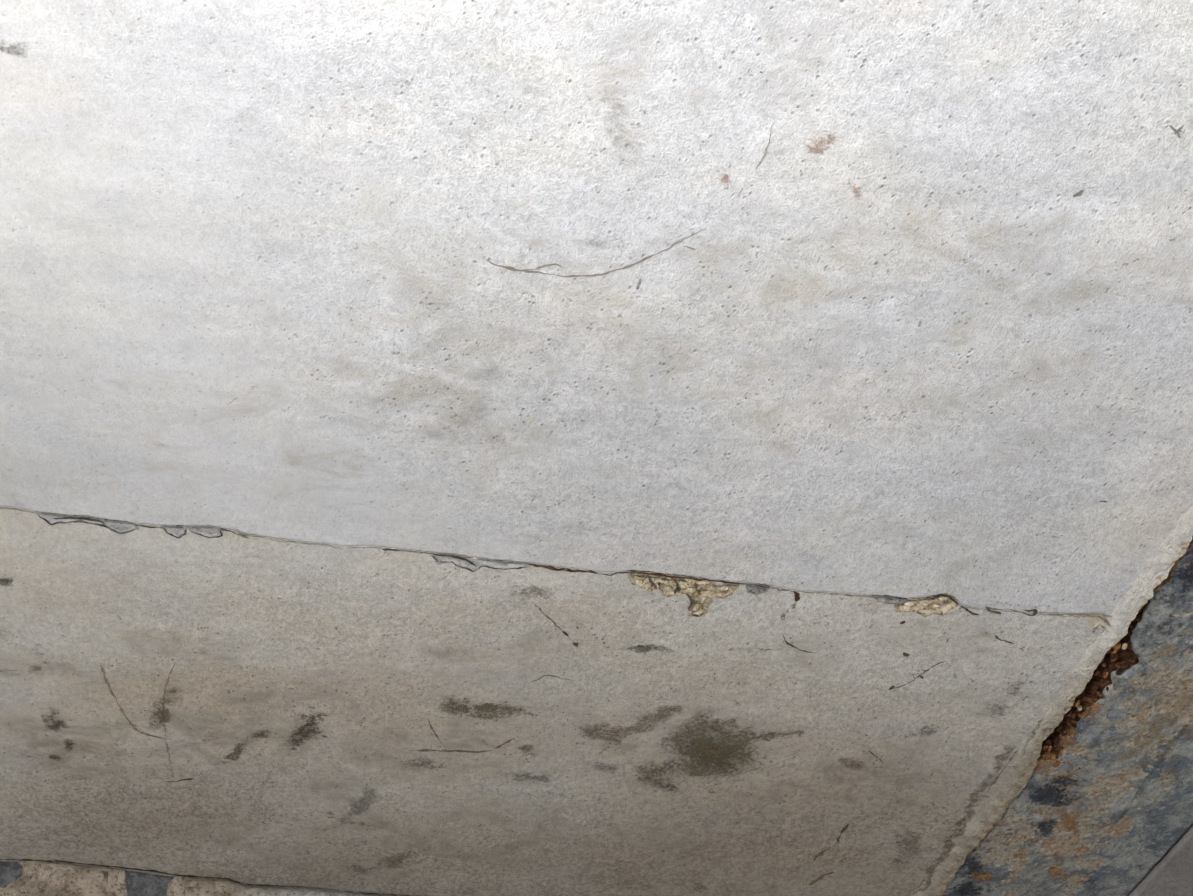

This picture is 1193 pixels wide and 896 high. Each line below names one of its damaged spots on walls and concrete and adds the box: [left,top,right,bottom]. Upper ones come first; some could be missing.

crack [485,229,704,290]
crack [0,507,1112,653]
spalling [627,570,770,617]
rust [1034,535,1193,773]
damp [580,706,801,790]